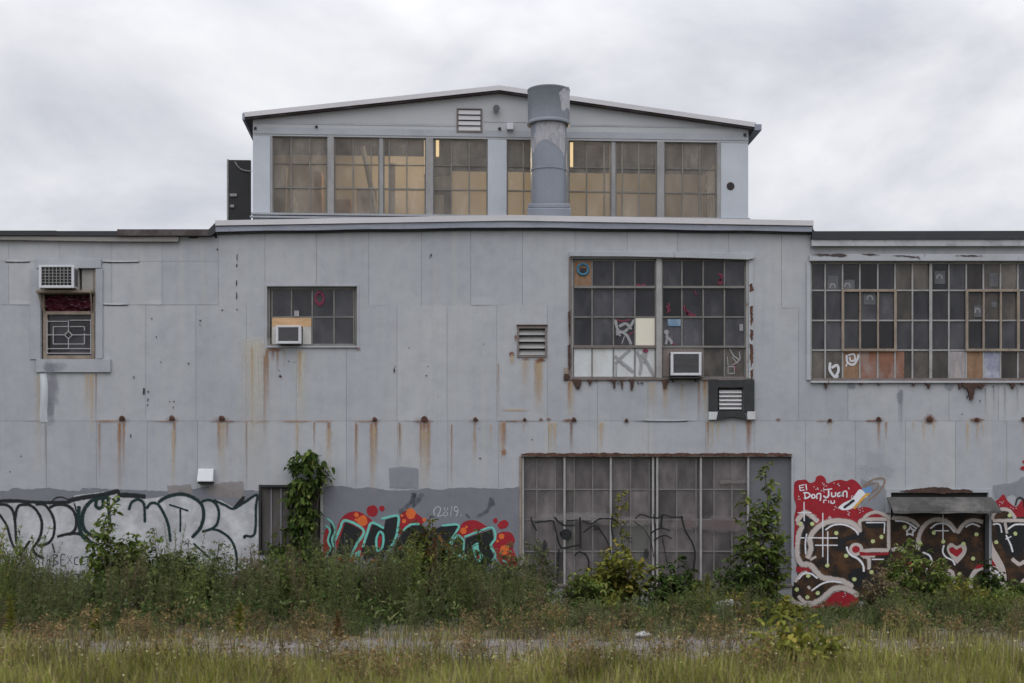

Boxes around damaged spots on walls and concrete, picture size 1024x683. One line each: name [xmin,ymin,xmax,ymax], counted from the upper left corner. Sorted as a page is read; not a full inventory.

rust [498,352,545,383]
rust [564,311,643,399]
rust [958,383,987,400]
rust [98,416,125,450]
rust [416,416,430,447]
rust [490,409,526,455]